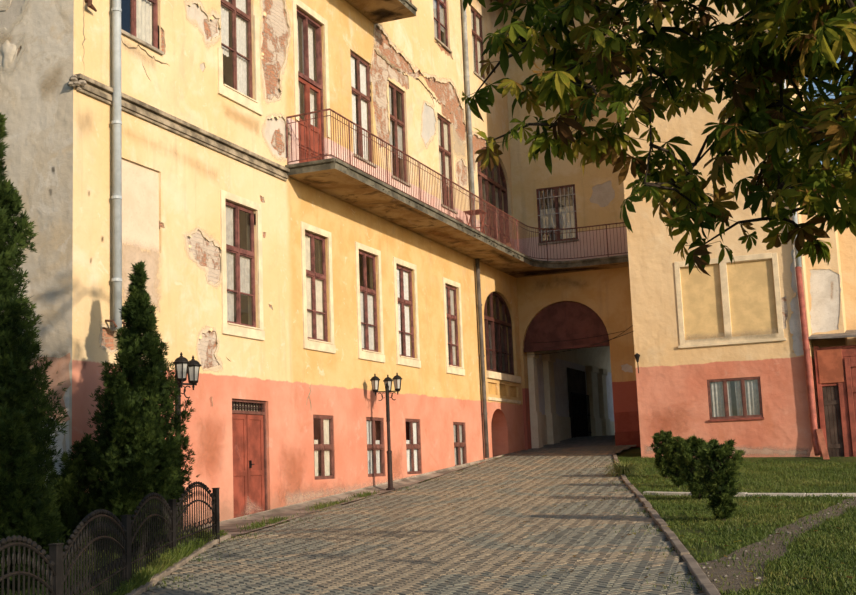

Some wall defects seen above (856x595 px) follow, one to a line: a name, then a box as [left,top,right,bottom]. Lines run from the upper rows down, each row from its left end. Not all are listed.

peeling [0,0,28,72]
peeling [185,0,221,46]
peeling [260,0,291,103]
peeling [366,24,491,189]
peeling [262,114,291,160]
peeling [185,228,222,286]
peeling [781,244,842,356]
flaking render [100,324,119,353]
peeling [197,326,222,371]